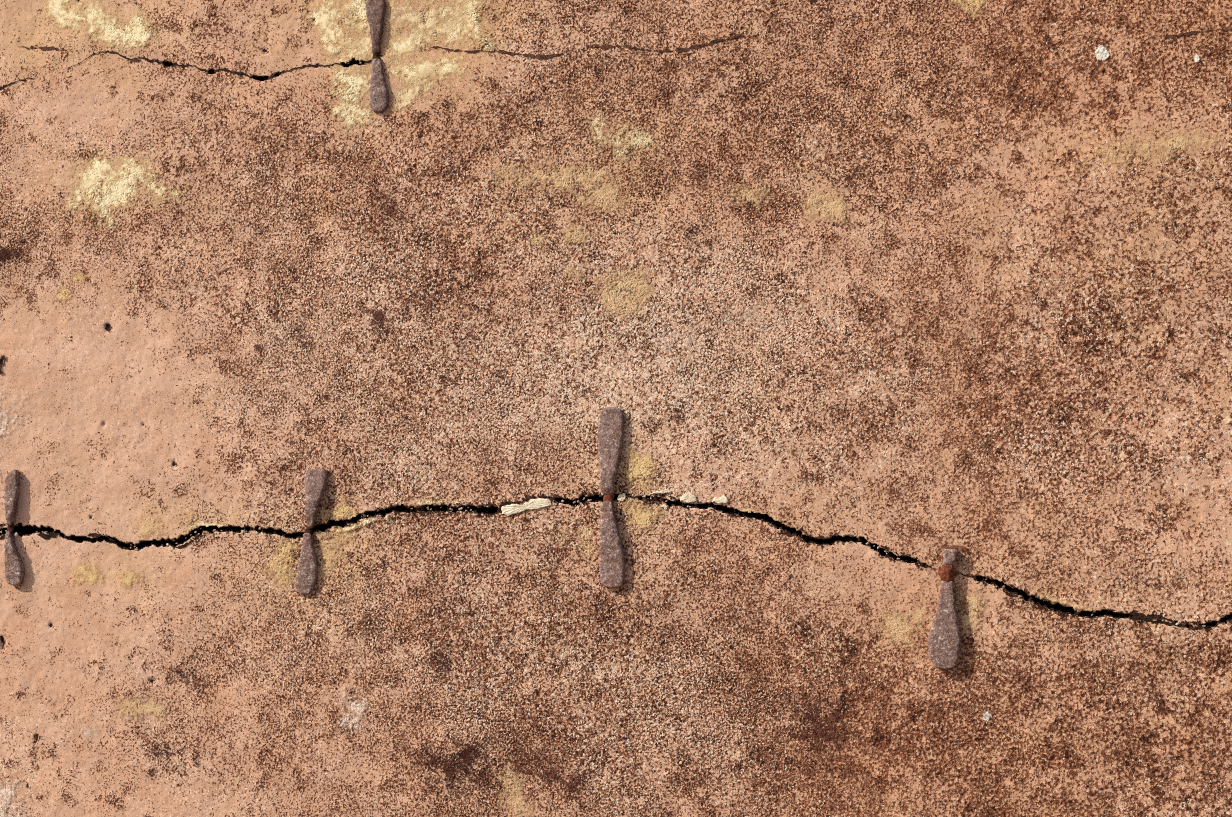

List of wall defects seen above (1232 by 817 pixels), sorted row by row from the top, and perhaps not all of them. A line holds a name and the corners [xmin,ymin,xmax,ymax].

crack [0,43,382,90]
crack [425,35,747,60]
crack [0,489,932,570]
crack [960,573,1232,633]